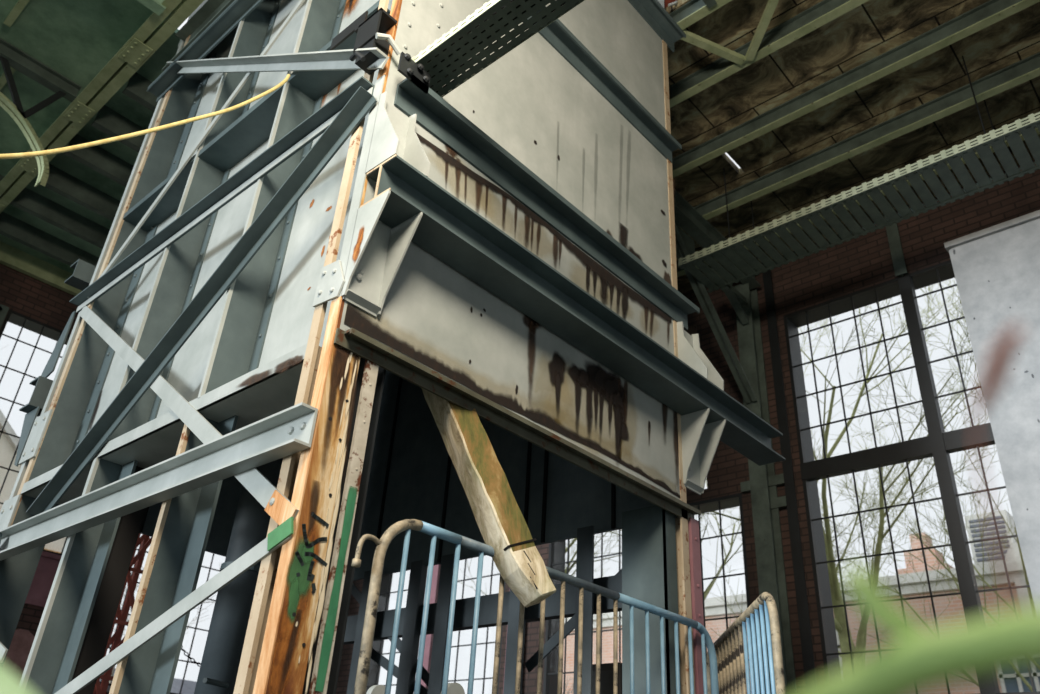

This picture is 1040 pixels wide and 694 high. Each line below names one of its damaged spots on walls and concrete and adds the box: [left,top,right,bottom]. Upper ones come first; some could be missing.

rust [416,133,672,340]
rust [344,302,681,499]